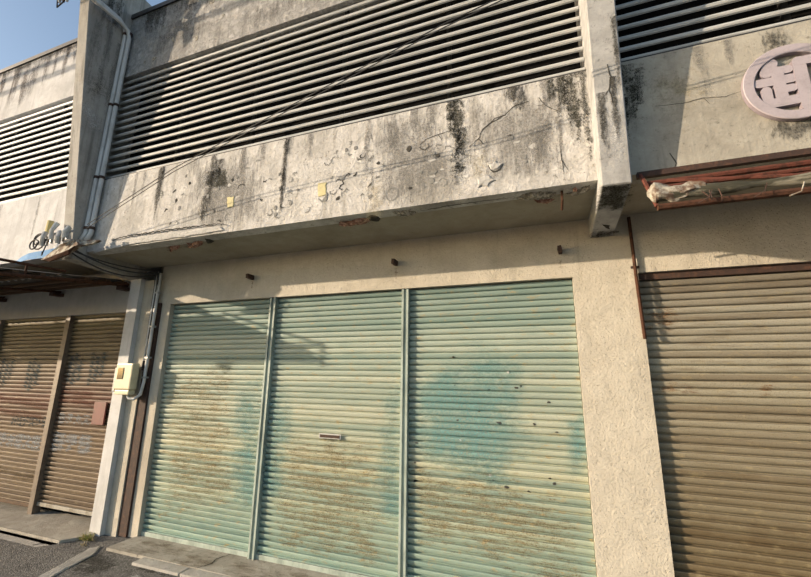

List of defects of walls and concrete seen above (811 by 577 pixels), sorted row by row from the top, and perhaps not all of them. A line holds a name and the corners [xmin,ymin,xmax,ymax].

damp [365,15,644,198]
crack [470,98,558,146]
damp [772,119,811,138]
damp [197,148,261,225]
corrosion [44,246,75,262]
corrosion [158,382,231,521]
corrosion [272,444,382,560]
corrosion [410,467,581,577]